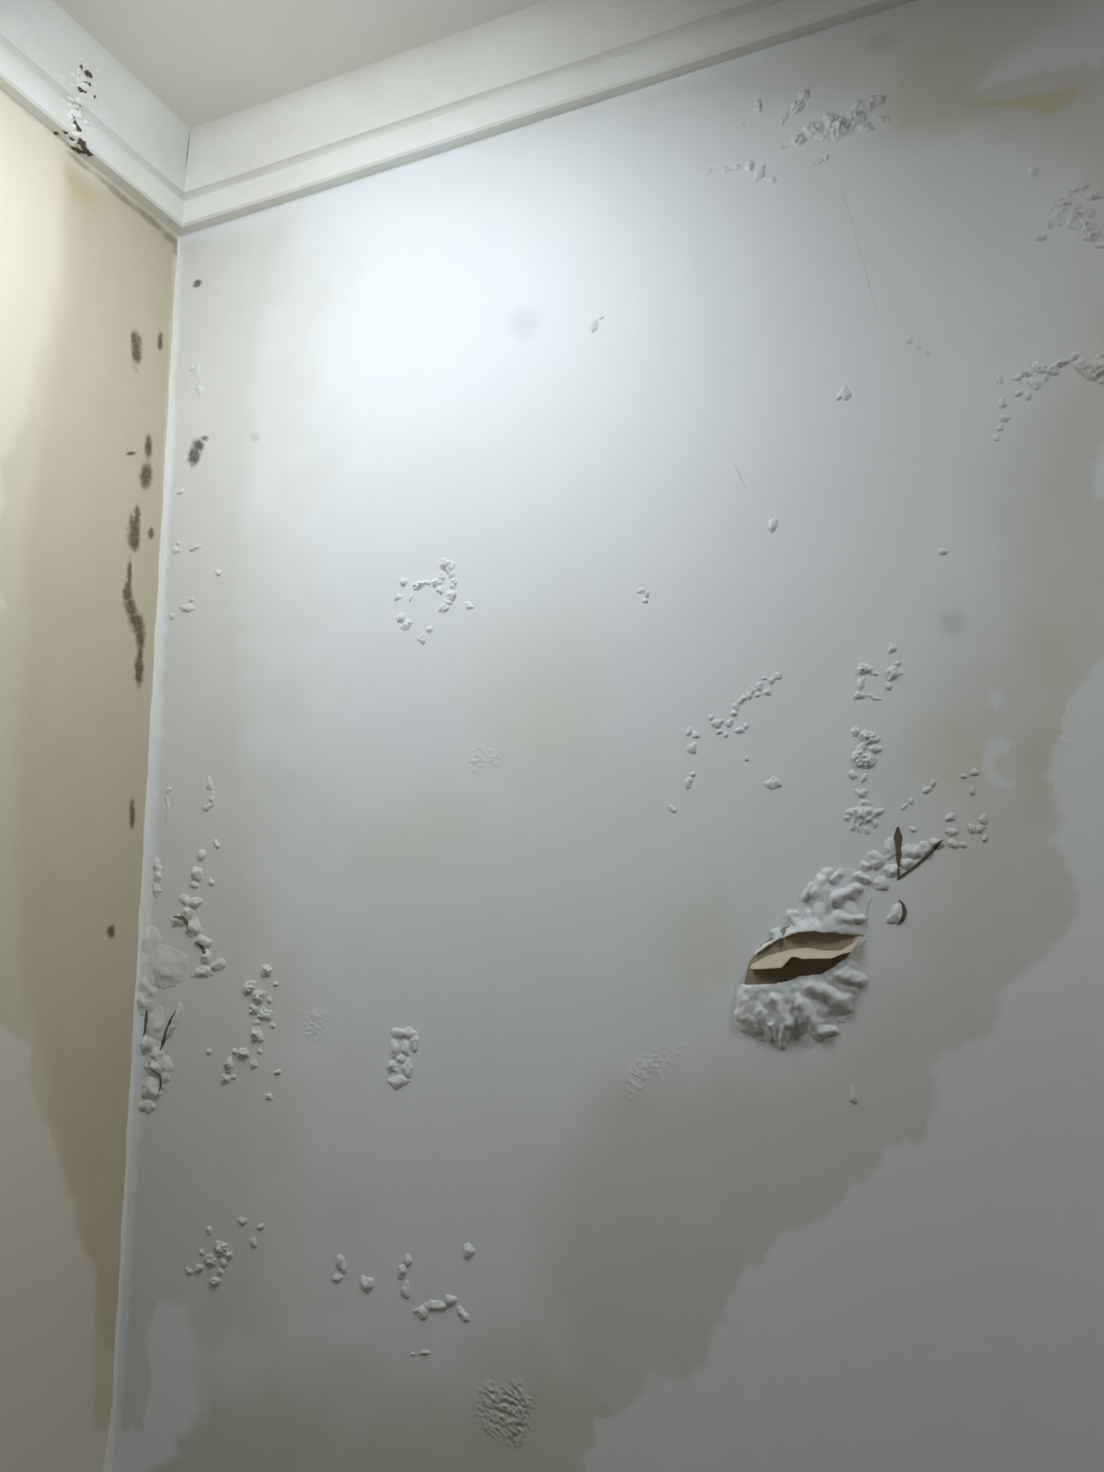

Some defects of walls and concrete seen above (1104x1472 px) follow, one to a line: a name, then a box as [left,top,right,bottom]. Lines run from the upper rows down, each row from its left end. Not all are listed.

water stain [0,57,178,1441]
peeling [136,894,226,1114]
water stain [117,192,639,1472]
water stain [459,0,1104,1436]